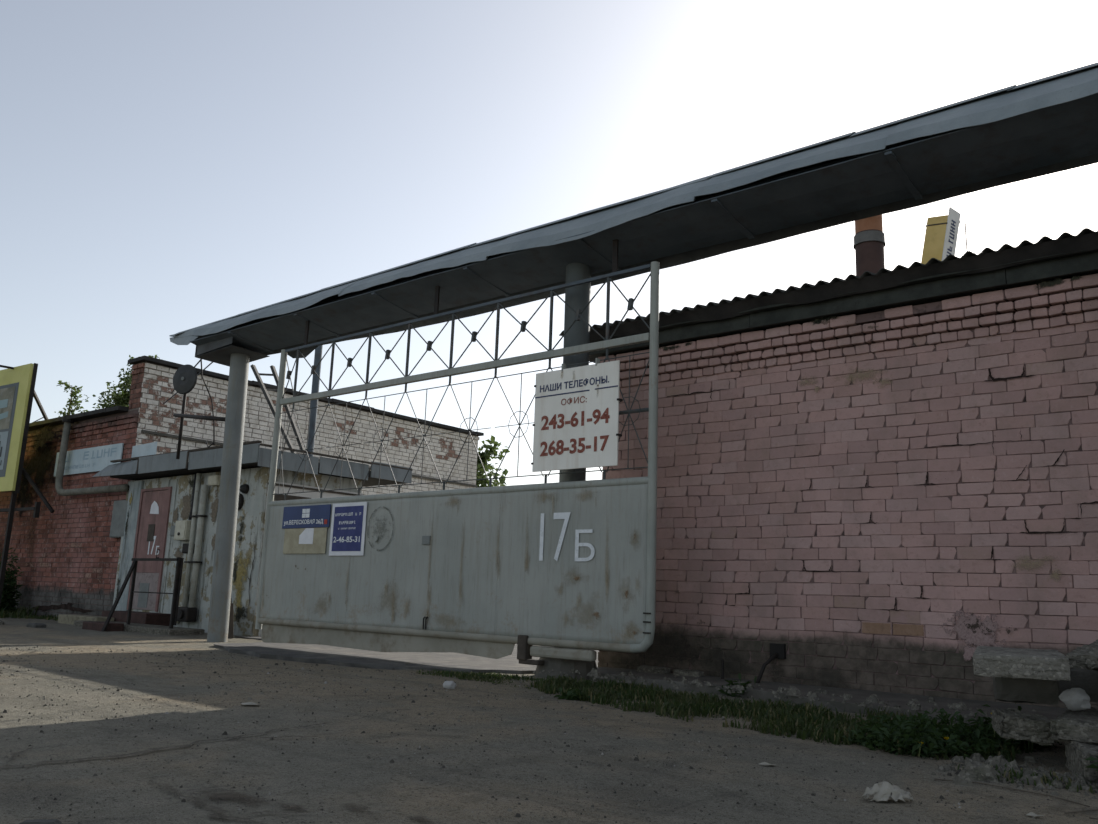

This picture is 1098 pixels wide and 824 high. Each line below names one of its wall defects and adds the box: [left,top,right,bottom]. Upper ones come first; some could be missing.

peeling [384,427,418,449]
peeling [436,438,461,460]
spalling [943,610,1018,660]